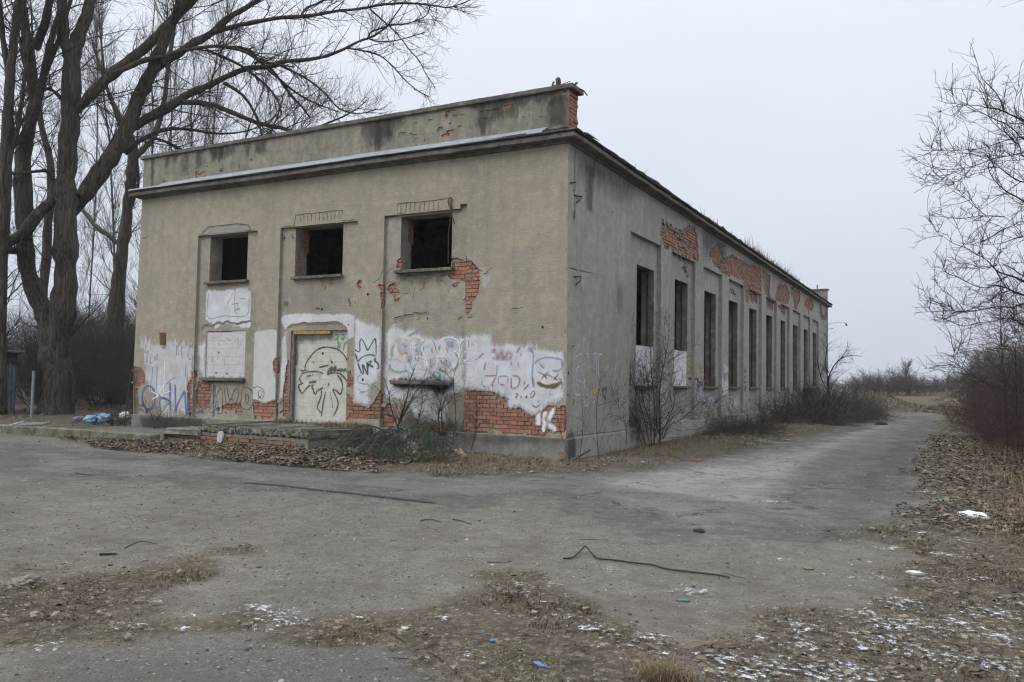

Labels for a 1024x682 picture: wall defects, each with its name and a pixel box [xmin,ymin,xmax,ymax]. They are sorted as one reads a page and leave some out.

damp [477,91,565,134]
spalling [448,258,481,317]
spalling [660,219,827,321]
spalling [131,366,149,415]
spalling [187,358,290,420]
spalling [346,358,396,428]
spalling [463,387,569,437]